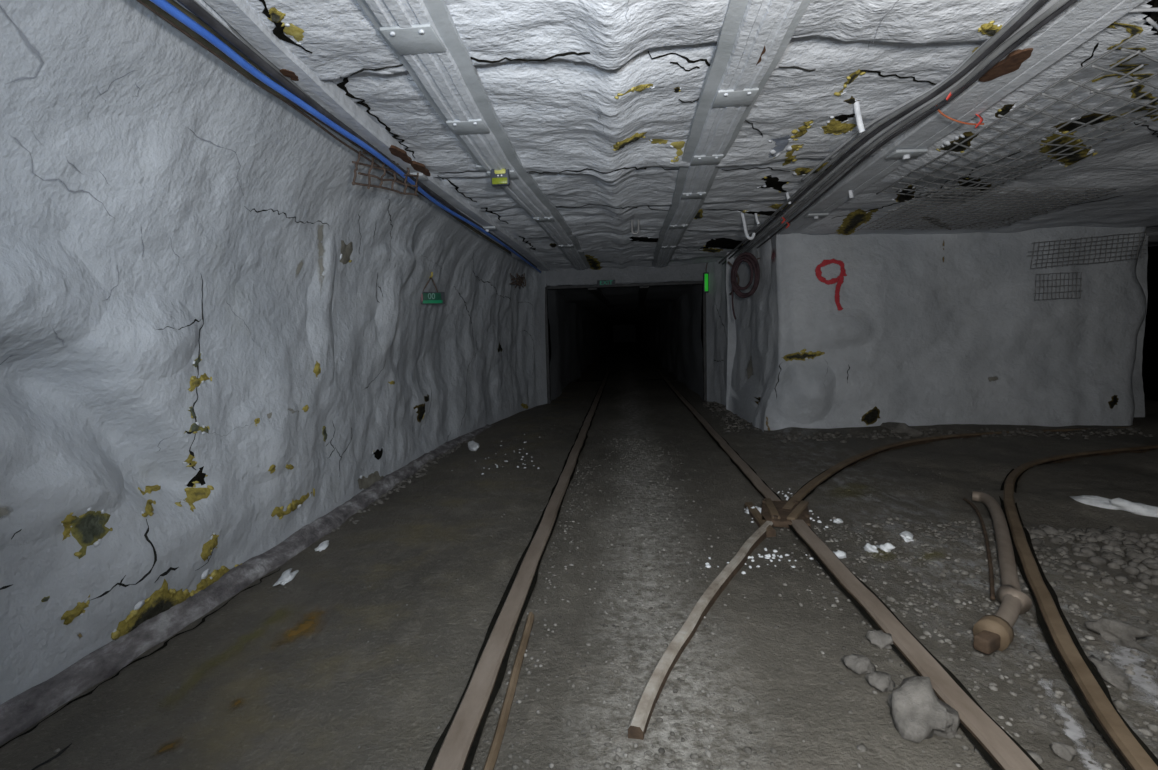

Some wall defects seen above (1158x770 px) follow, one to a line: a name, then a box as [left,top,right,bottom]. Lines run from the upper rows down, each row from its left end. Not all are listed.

spalling [972,21,1002,52]
crack [470,52,600,118]
crack [631,51,711,107]
crack [779,65,816,73]
spalling [995,103,1016,118]
rust [979,48,1033,82]
spalling [610,132,685,164]
spalling [936,132,979,153]
spalling [1039,113,1113,167]
spalling [175,454,214,512]
crack [89,519,217,601]
spalling [111,533,242,641]